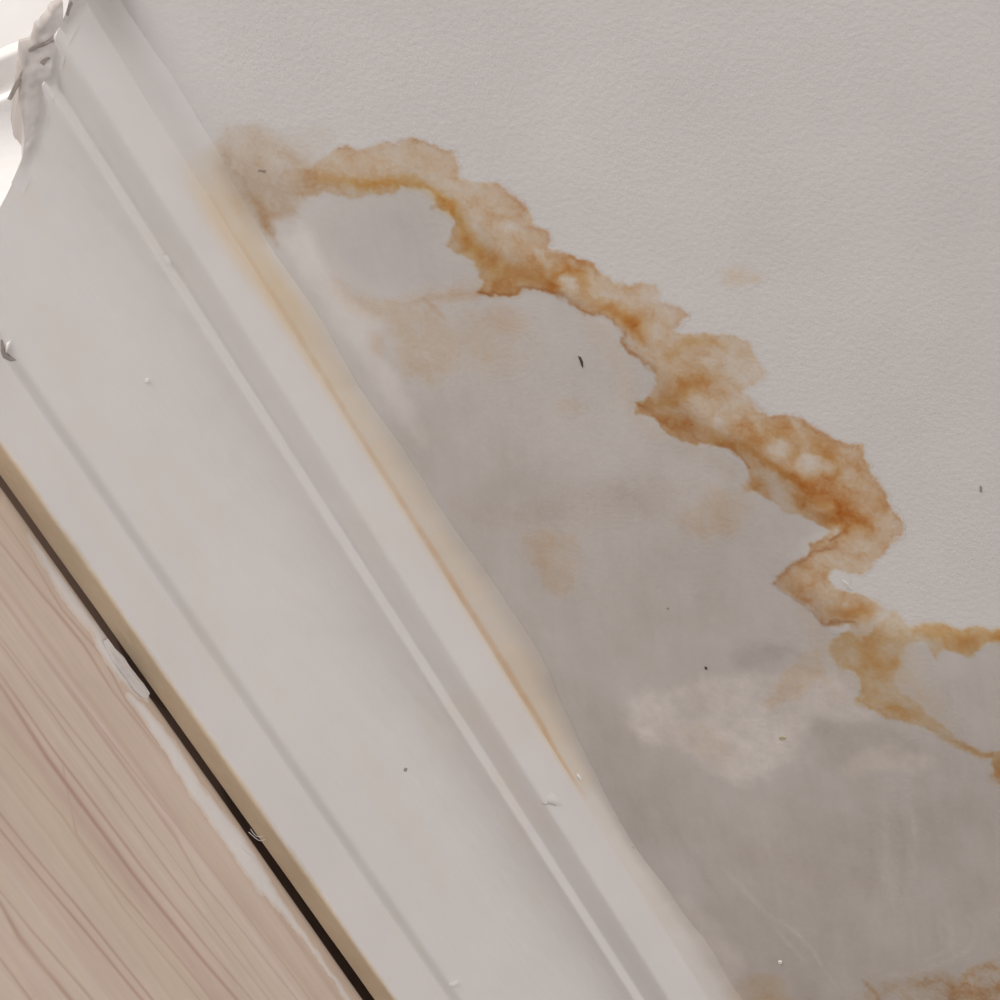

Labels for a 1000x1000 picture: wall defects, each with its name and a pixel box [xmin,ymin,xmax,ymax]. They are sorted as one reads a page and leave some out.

leakage [86,0,153,86]
leakage [158,111,1000,1000]